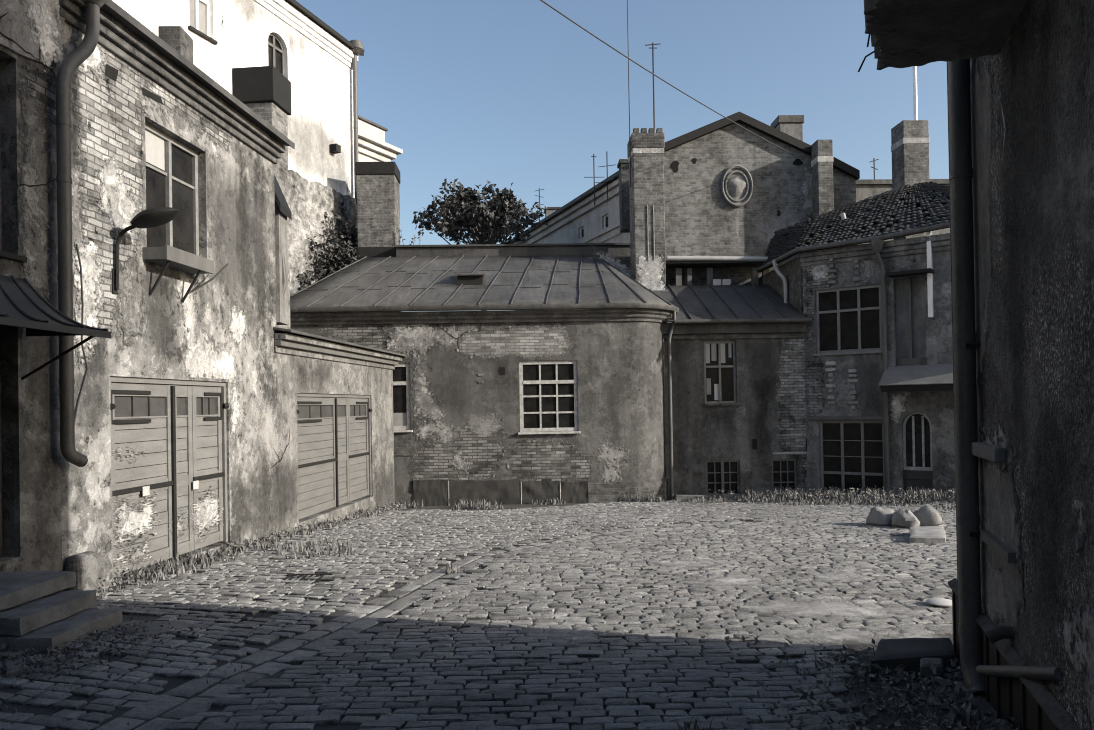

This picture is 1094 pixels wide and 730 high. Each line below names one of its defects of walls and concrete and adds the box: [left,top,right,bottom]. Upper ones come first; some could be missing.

crack [0,12,41,61]
flaking render [17,0,85,299]
spalling [71,43,232,369]
spalling [319,323,633,484]
peeling [112,485,224,577]
flaking render [1055,580,1094,730]